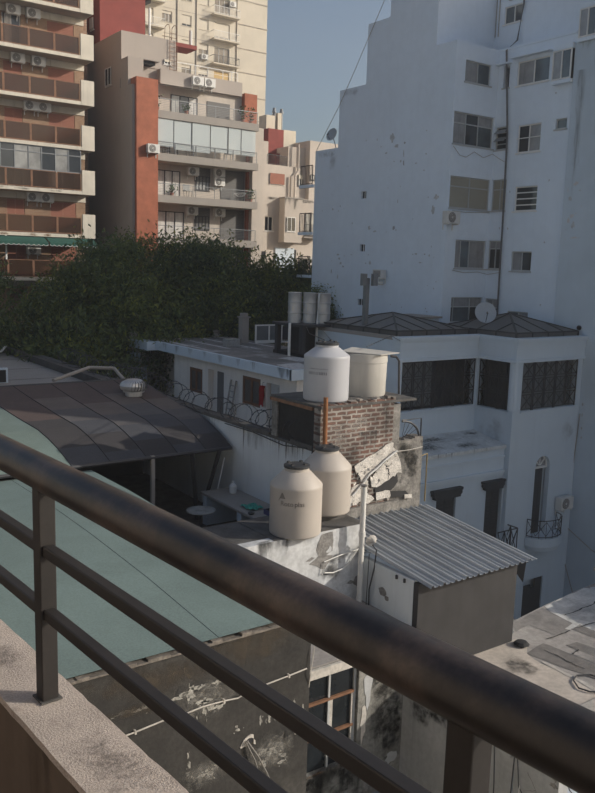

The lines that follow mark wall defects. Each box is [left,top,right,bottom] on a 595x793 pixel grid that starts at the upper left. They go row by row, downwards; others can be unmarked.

peeling [350,442,402,507]
flaking render [306,532,334,569]
peeling [171,680,225,722]
damp [374,684,400,758]
peeling [186,752,218,778]
peeling [234,725,288,767]